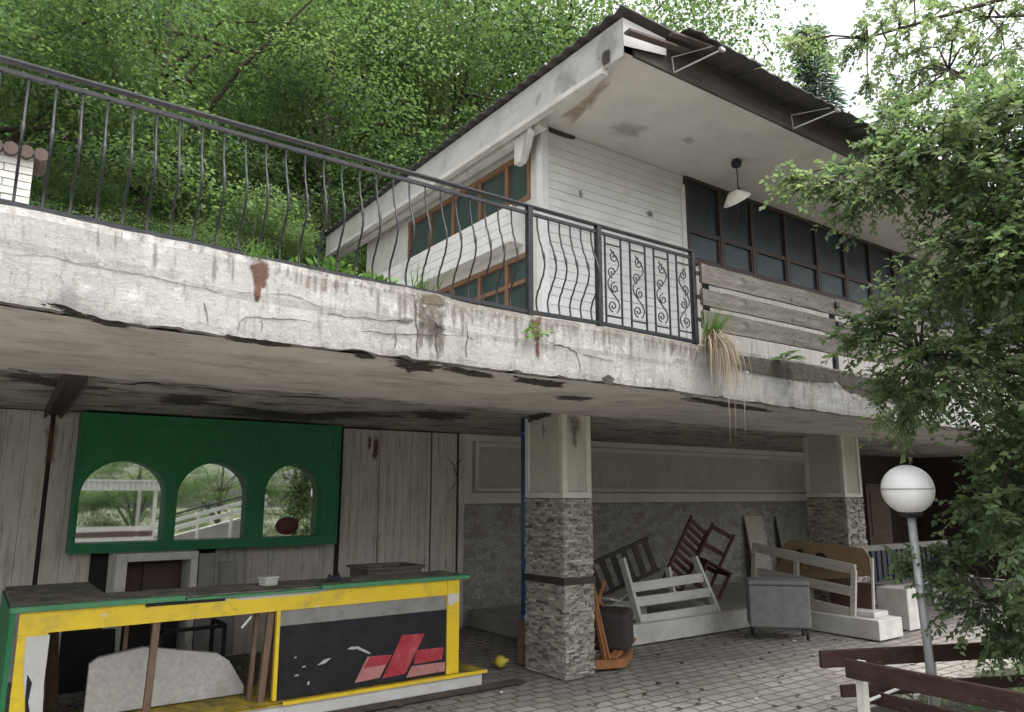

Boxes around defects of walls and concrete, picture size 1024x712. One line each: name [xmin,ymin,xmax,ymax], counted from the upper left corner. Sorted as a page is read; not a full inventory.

rust [251,259,269,302]
crack [0,251,474,357]
damp [395,298,445,353]
spalling [390,360,494,379]
spalling [512,376,567,389]
spalling [681,396,775,412]
rust [368,437,379,458]